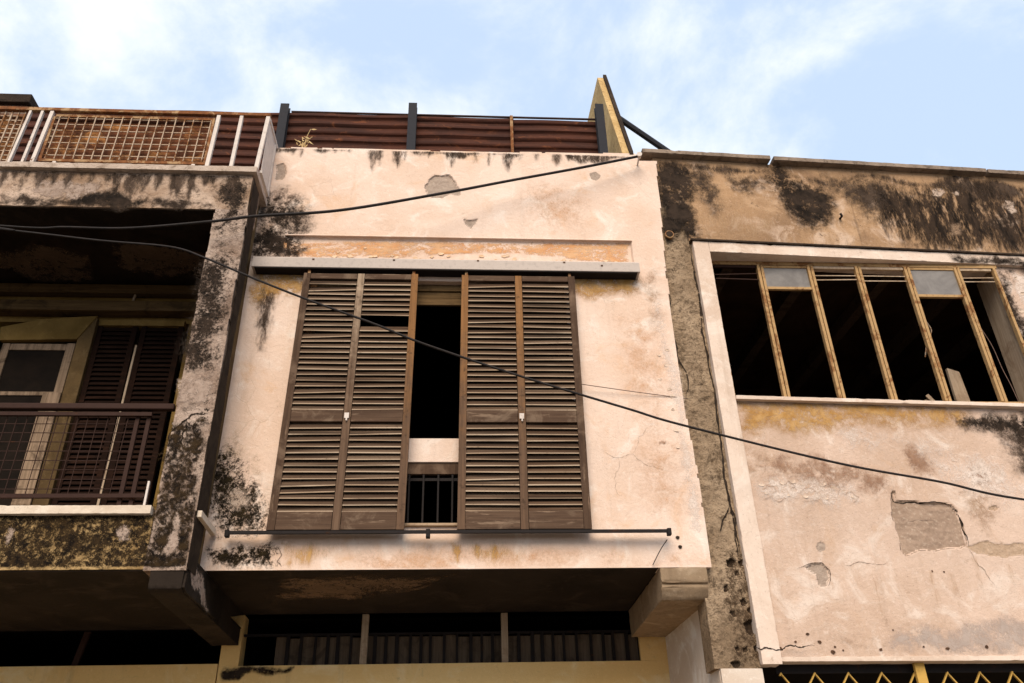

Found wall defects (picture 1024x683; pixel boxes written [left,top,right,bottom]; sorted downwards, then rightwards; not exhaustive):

leakage [369,150,401,166]
spalling [425,175,460,199]
leakage [657,162,719,242]
leakage [728,165,1024,340]
leakage [0,171,310,576]
crack [675,248,741,556]
leakage [956,411,1024,472]
spalling [891,491,1024,558]
spalling [800,542,831,587]
crack [754,644,814,652]